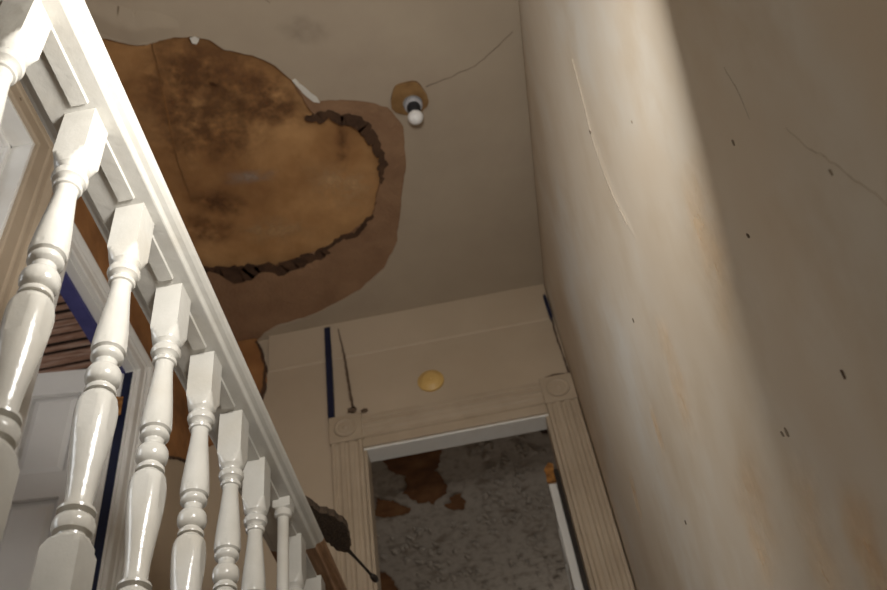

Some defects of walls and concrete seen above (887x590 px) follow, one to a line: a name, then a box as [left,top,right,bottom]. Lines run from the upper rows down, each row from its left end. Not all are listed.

spalling [74,197,109,282]
spalling [102,36,406,400]
crack [338,329,368,413]
spalling [165,370,191,463]
peeling [375,449,466,518]